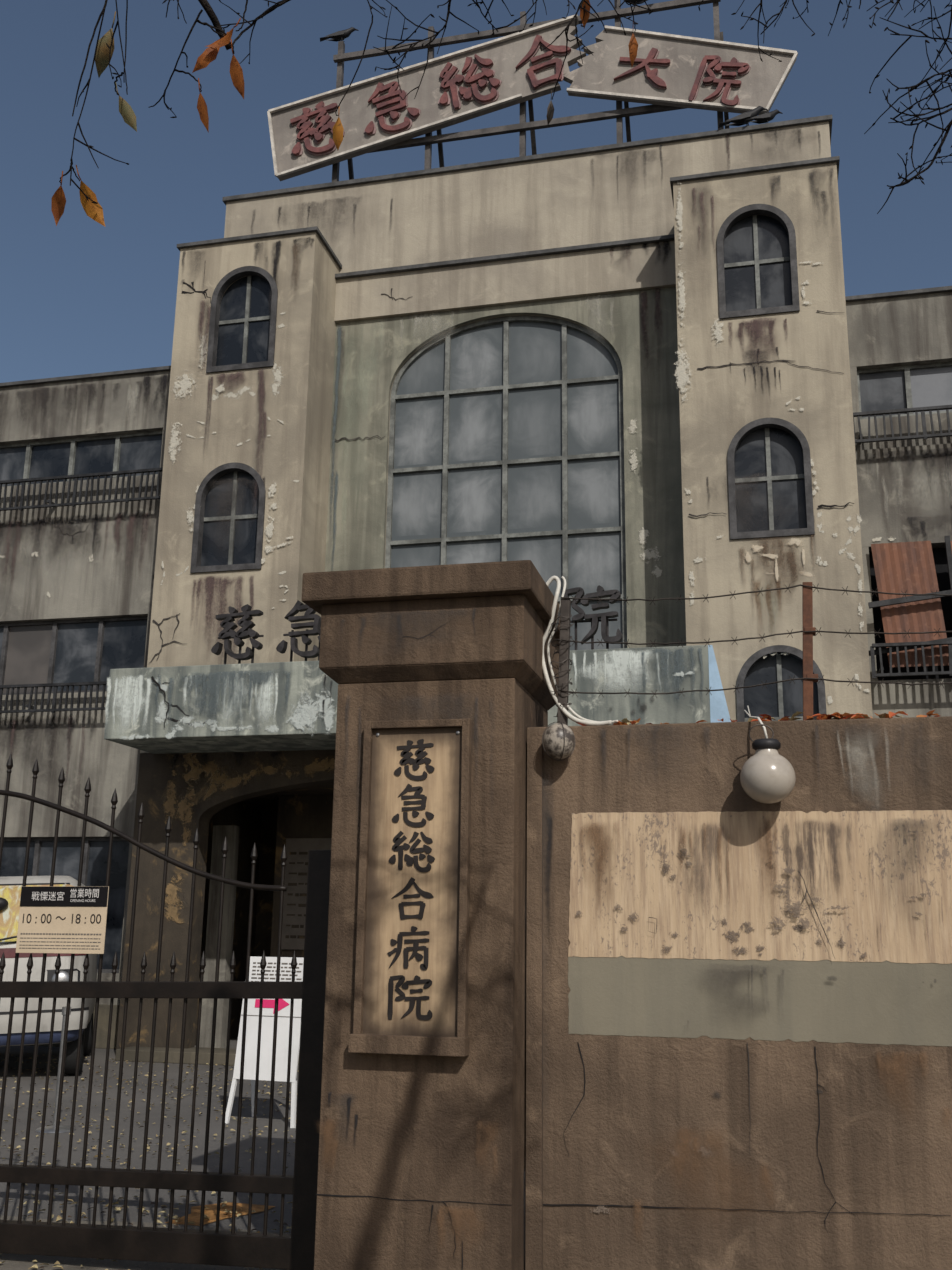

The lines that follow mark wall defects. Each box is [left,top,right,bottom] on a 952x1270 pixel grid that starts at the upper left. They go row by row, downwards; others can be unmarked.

leakage [730,347,780,382]
crack [697,360,844,374]
peeling [628,419,638,471]
leakage [0,511,148,568]
peeling [639,527,662,578]
peeling [745,545,779,582]
peeling [788,512,864,631]
crack [149,613,207,728]
peeling [153,677,335,739]
peeling [162,753,335,846]
peeling [164,874,184,923]
crack [543,1042,951,1233]